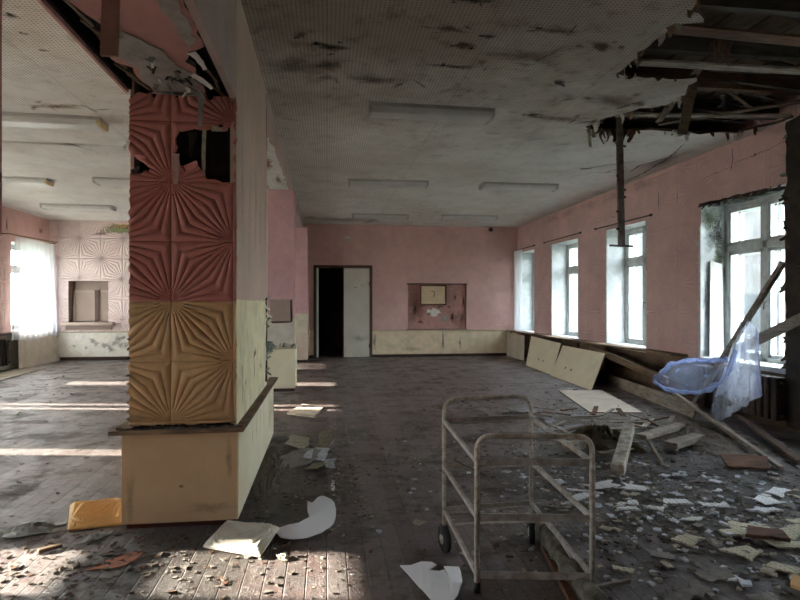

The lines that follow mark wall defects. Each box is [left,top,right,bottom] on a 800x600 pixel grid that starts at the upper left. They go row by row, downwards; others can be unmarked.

peeling [119,0,213,100]